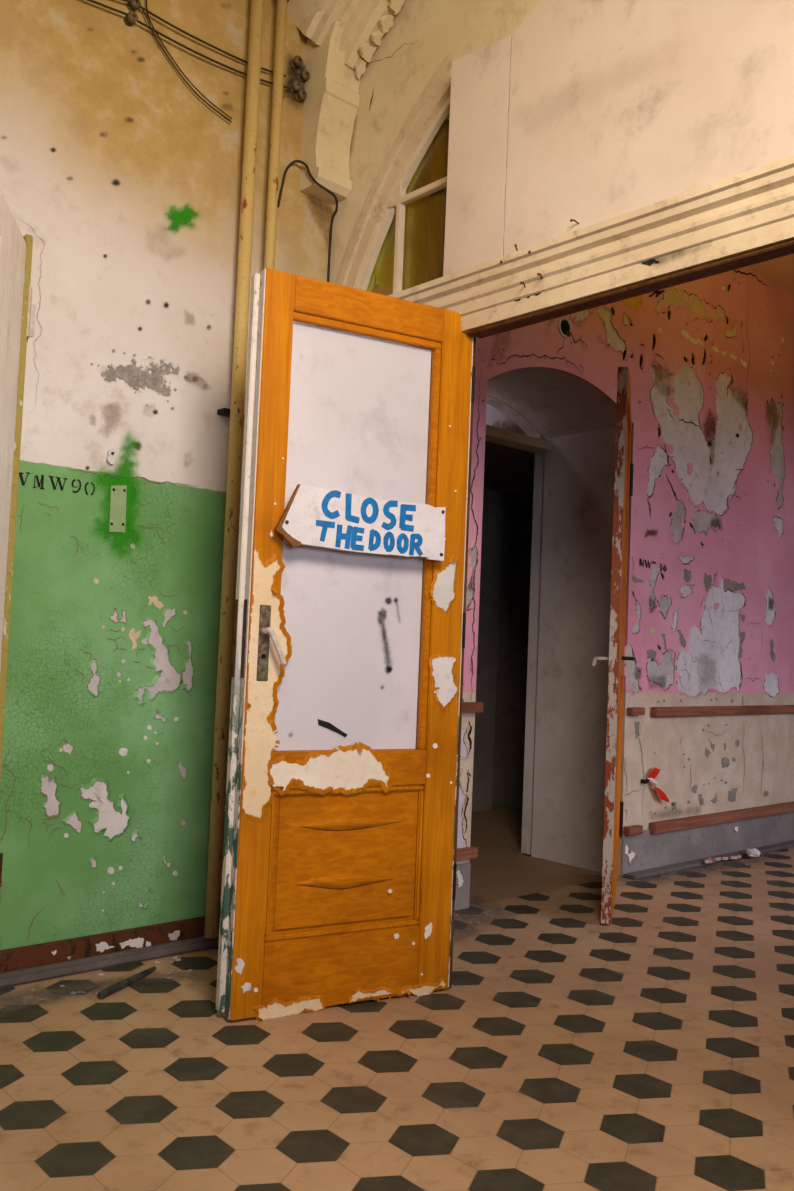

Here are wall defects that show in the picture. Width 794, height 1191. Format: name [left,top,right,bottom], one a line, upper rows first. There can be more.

crack [461,270,784,833]
peeling [547,284,753,703]
peeling [766,399,786,542]
peeling [86,659,101,698]
peeling [102,596,195,745]
peeling [428,653,465,713]
peeling [762,583,780,699]
peeling [38,764,143,843]
peeling [450,724,470,849]
peeling [88,853,122,894]